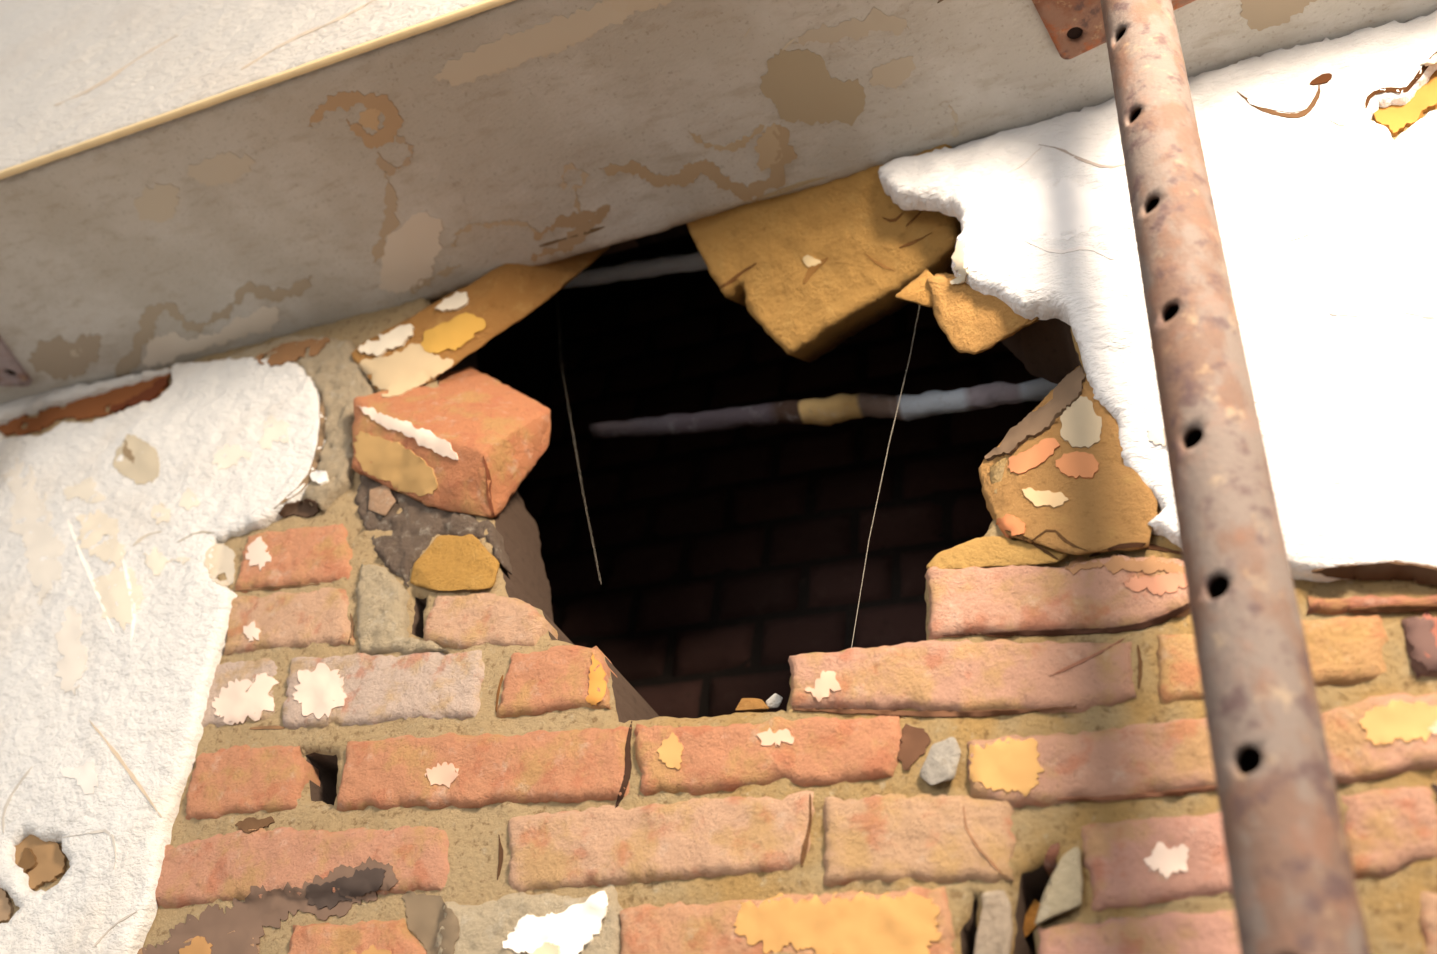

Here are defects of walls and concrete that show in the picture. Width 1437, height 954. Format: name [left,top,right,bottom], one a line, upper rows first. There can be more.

damp [371,7,916,295]
crack [1237,84,1321,118]
crack [1365,52,1437,109]
damp [28,333,102,381]
damp [115,275,313,378]
spalling [356,324,459,460]
flaking render [435,292,469,313]
damp [421,312,486,354]
flaking render [878,97,1181,548]
flaking render [1188,10,1437,583]
flaking render [0,337,330,954]
flaking render [503,891,608,954]